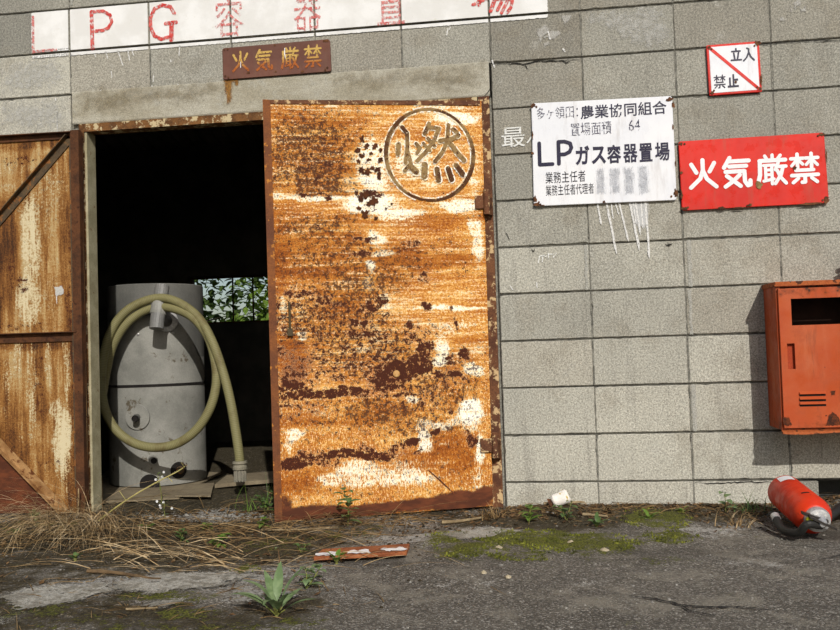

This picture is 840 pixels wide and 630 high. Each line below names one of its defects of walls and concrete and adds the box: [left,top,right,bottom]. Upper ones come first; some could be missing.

rust [225,79,238,104]
water stain [597,202,650,259]